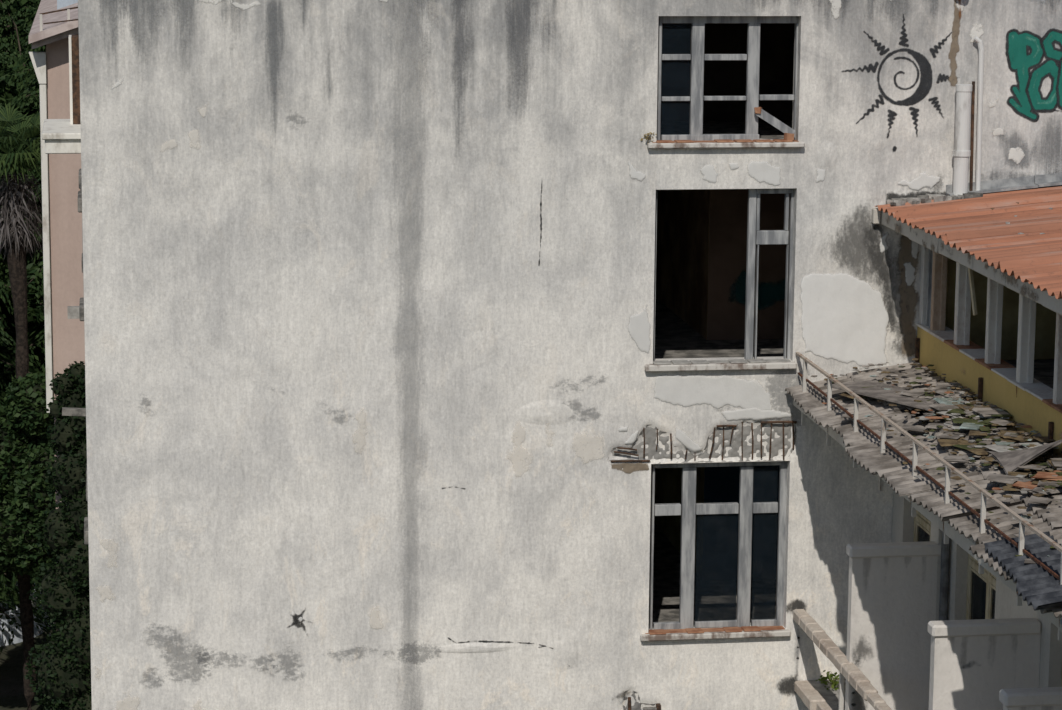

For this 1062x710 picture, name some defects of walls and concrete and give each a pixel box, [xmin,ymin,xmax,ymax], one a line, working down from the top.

rust [949,0,961,86]
crack [536,184,544,264]
water stain [886,173,947,202]
water stain [836,212,919,356]
peeling [608,375,796,464]